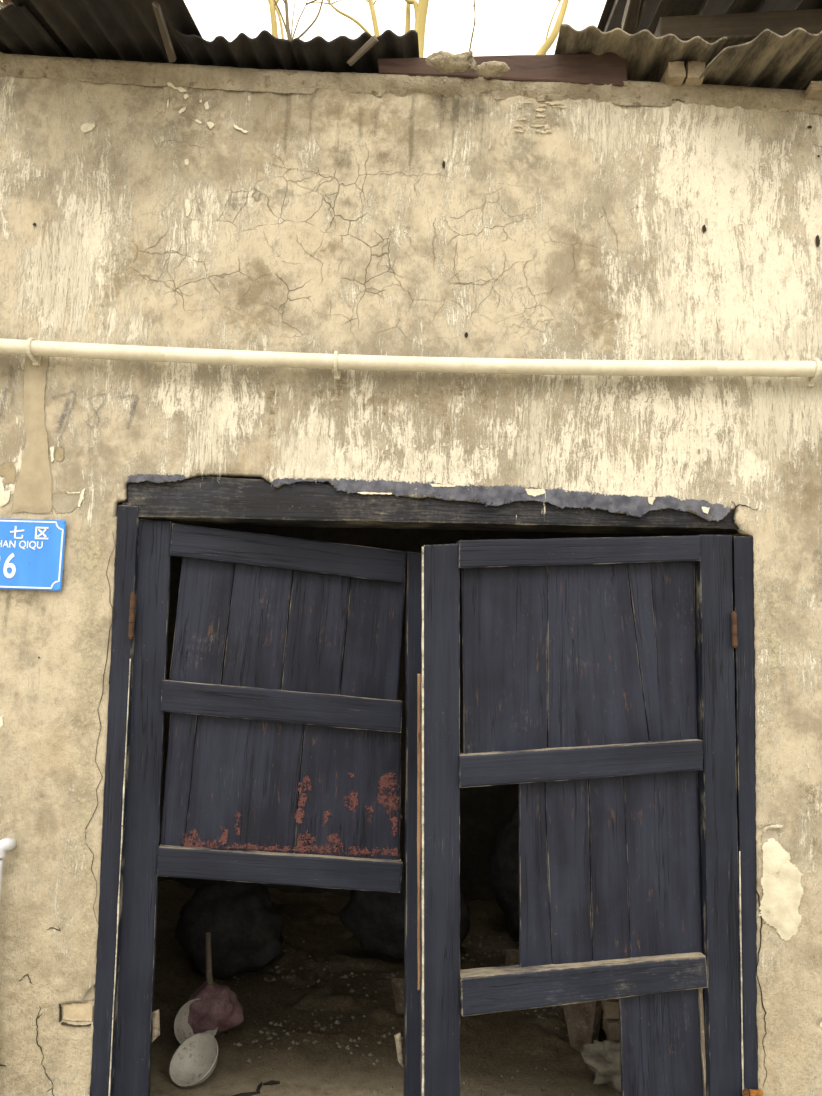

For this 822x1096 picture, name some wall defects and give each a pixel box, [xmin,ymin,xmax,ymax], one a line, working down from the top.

crack [140,242,201,305]
crack [264,149,557,336]
peeling [128,474,185,483]
peeling [272,477,730,521]
crack [19,974,54,1096]